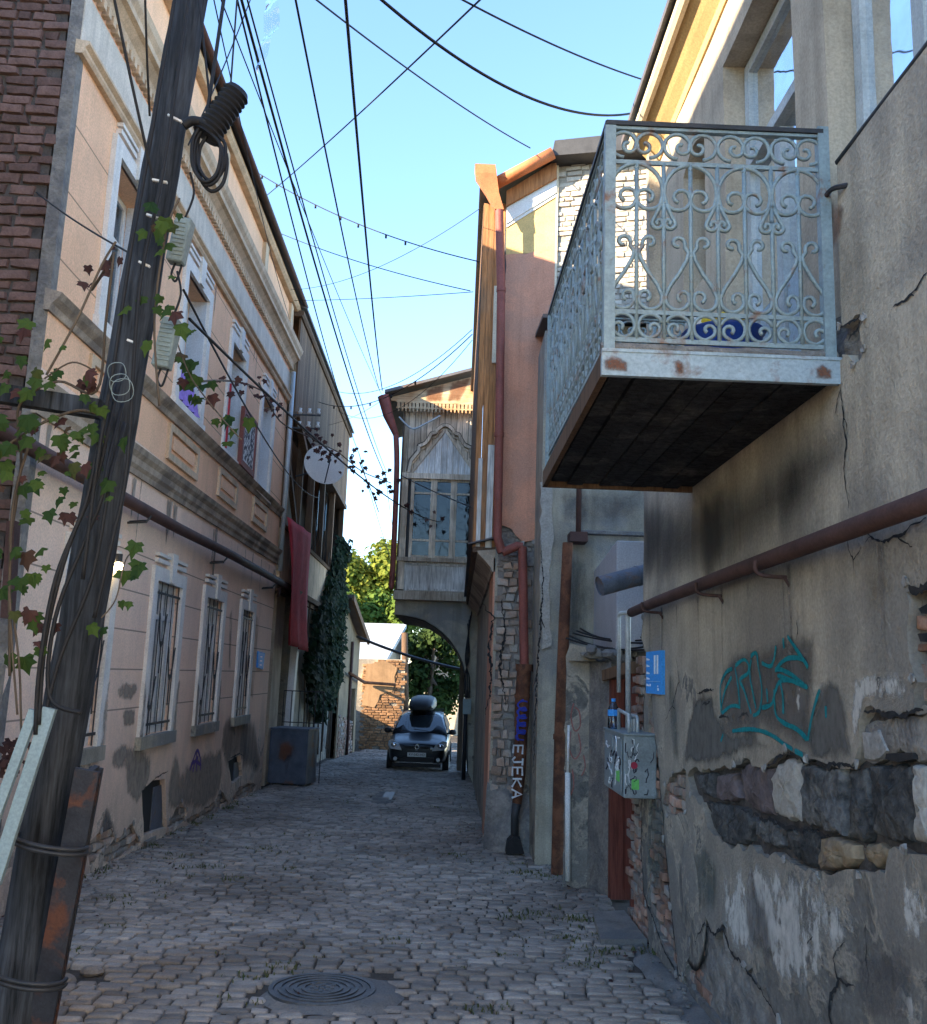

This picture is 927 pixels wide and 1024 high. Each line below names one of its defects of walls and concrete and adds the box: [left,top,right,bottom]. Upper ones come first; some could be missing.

crack [892,272,927,308]
rust [605,358,627,371]
rust [817,366,831,378]
spalling [836,313,867,369]
crack [835,385,849,507]
water stain [645,499,769,571]
crack [847,517,926,572]
water stain [170,687,259,806]
spalling [641,575,927,1024]
water stain [695,853,843,983]
water stain [904,883,927,936]